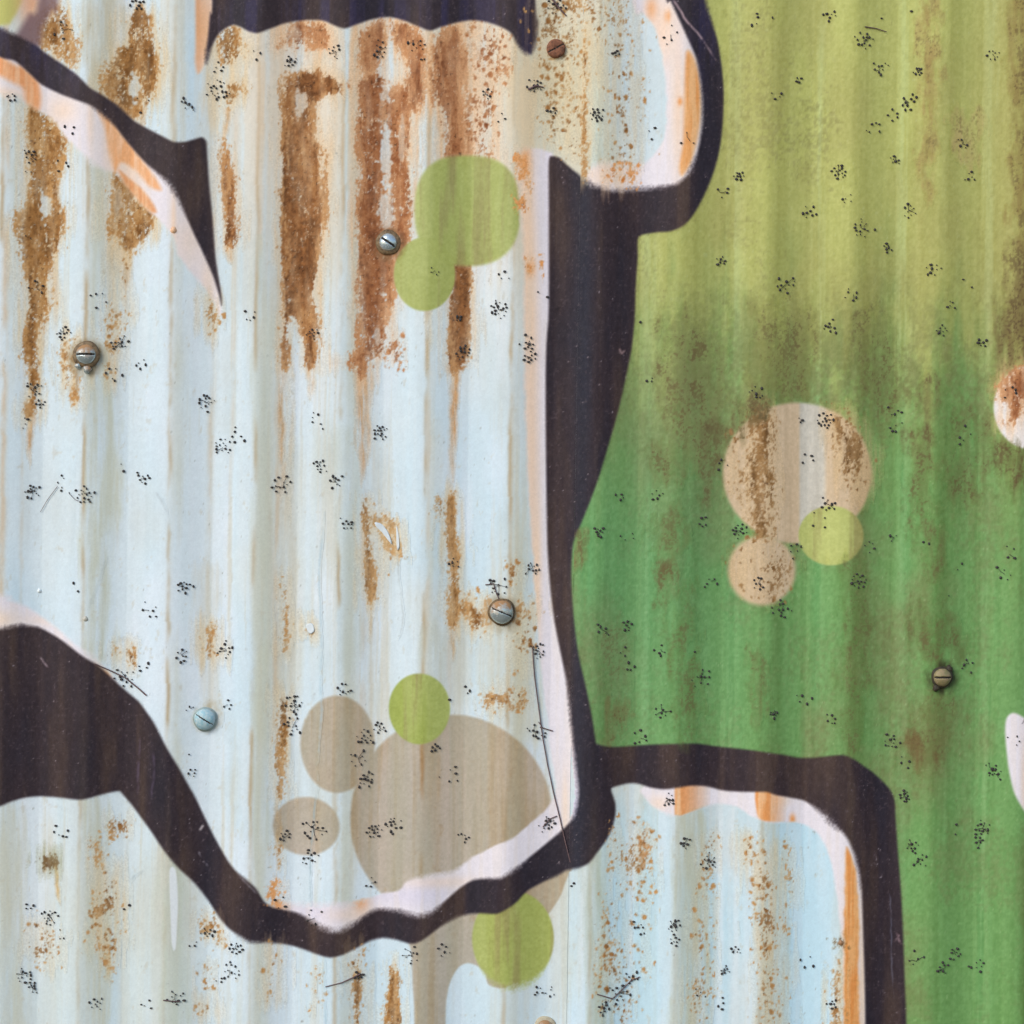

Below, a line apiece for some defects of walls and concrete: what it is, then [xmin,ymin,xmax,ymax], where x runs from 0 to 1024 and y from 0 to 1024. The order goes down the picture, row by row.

rust [43,0,174,128]
rust [0,101,168,470]
rust [206,0,660,644]
rust [423,267,553,726]
rust [721,392,807,614]
rust [818,395,886,516]
rust [987,356,1024,441]
rust [591,811,665,1024]
rust [678,824,806,1024]
rust [820,928,860,1024]